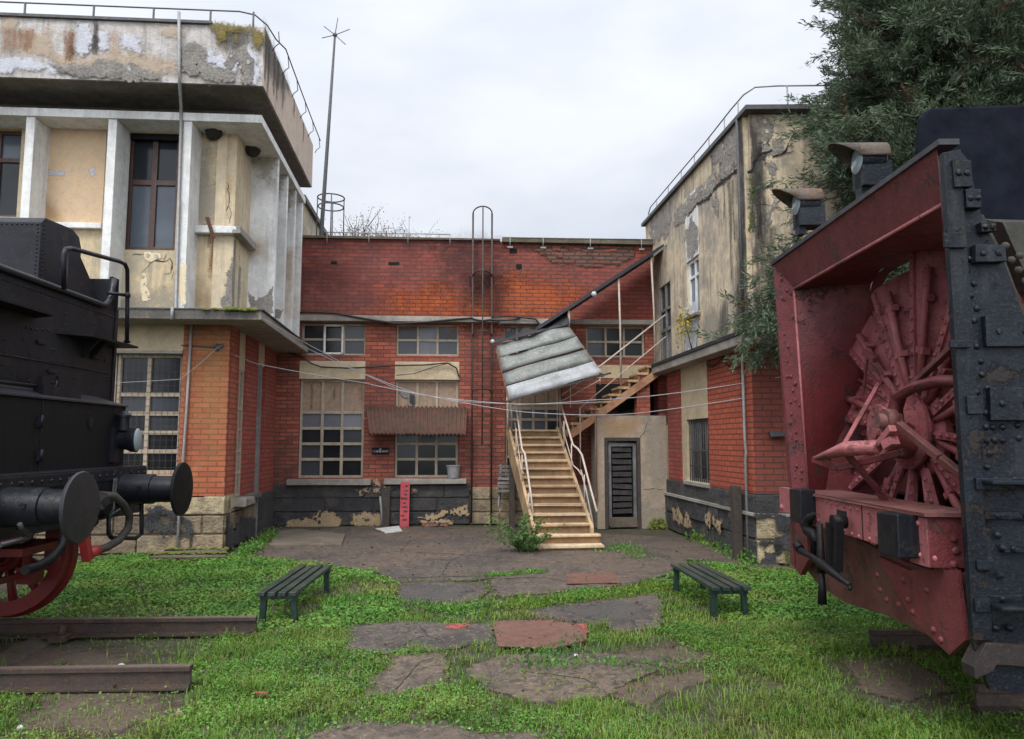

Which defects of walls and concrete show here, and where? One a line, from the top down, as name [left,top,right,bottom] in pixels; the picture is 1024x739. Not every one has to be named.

spalling [0,17,261,85]
spalling [649,125,737,260]
spalling [757,114,809,245]
water stain [712,117,774,337]
peeling [140,251,166,301]
spalling [510,245,635,270]
peeling [286,510,381,527]
peeling [418,505,469,525]
peeling [671,504,692,528]
peeling [705,511,723,533]